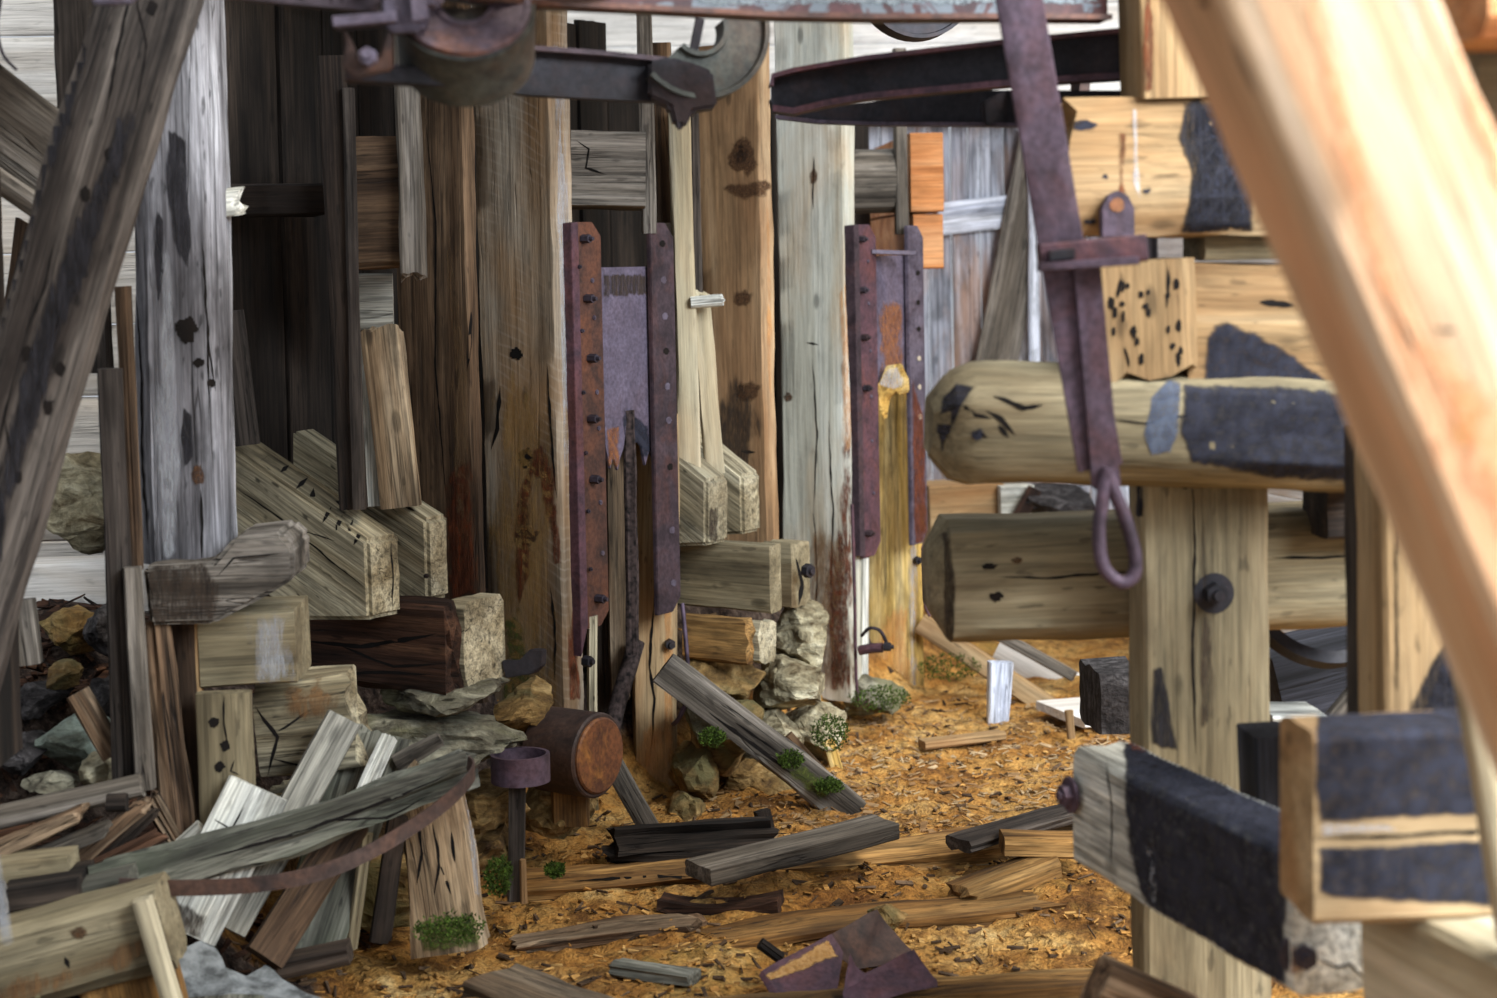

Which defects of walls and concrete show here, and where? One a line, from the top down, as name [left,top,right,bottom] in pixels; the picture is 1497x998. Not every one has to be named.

rust [880,304,902,366]
rust [608,428,619,466]
rust [913,386,927,543]